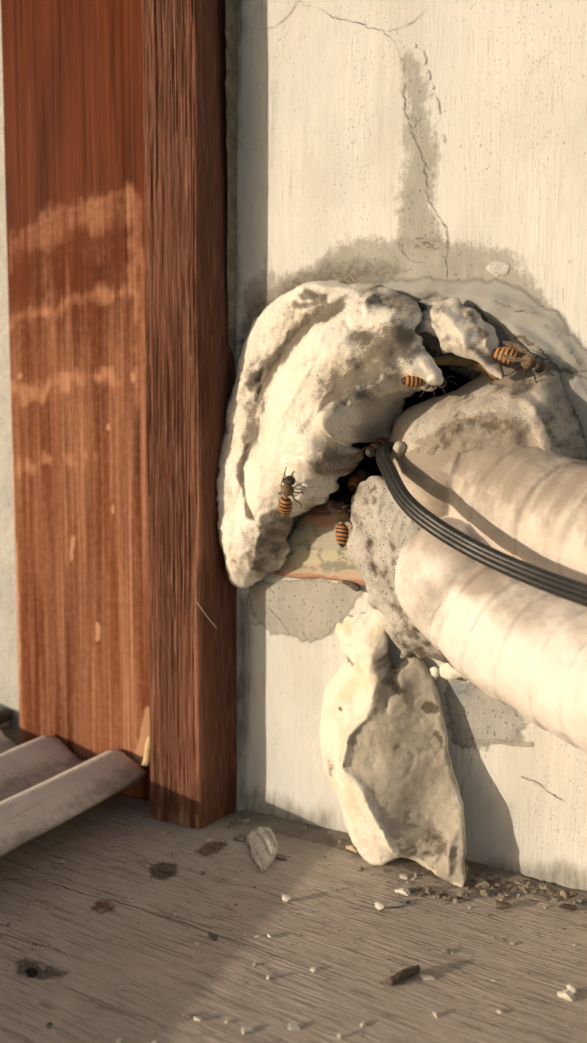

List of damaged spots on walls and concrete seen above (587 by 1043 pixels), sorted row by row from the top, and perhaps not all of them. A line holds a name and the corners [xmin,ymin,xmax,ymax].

crack [259,0,448,277]
peeling [244,43,549,324]
leakage [237,267,385,364]
peeling [417,332,480,371]
peeling [493,326,523,364]
peeling [248,579,363,642]
peeling [429,663,533,752]